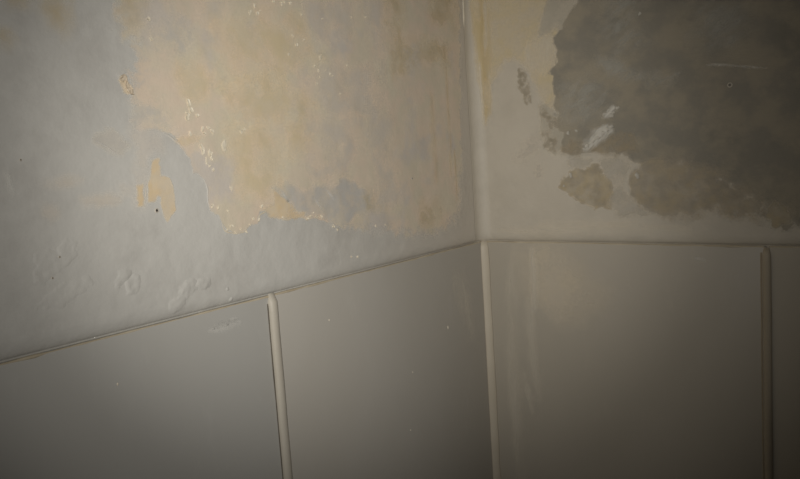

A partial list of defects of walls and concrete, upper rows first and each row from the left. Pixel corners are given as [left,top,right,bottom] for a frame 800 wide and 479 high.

peeling [137,159,176,222]